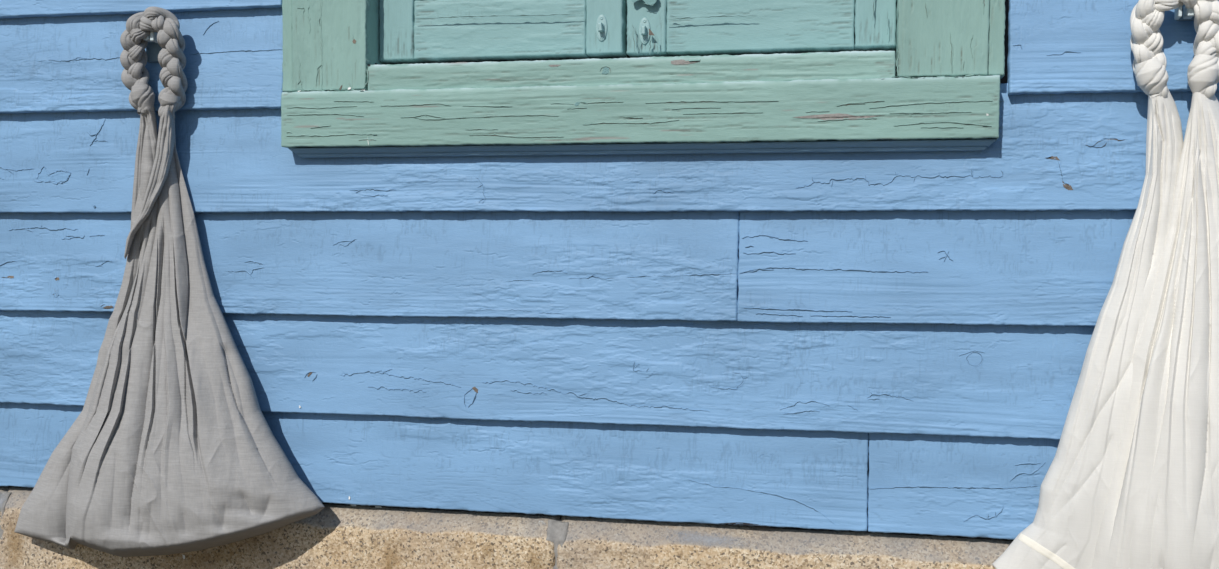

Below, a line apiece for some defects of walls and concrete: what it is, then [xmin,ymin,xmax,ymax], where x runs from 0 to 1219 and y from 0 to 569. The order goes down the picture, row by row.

peeling [794,111,884,121]
crack [798,169,1004,188]
crack [342,369,747,411]